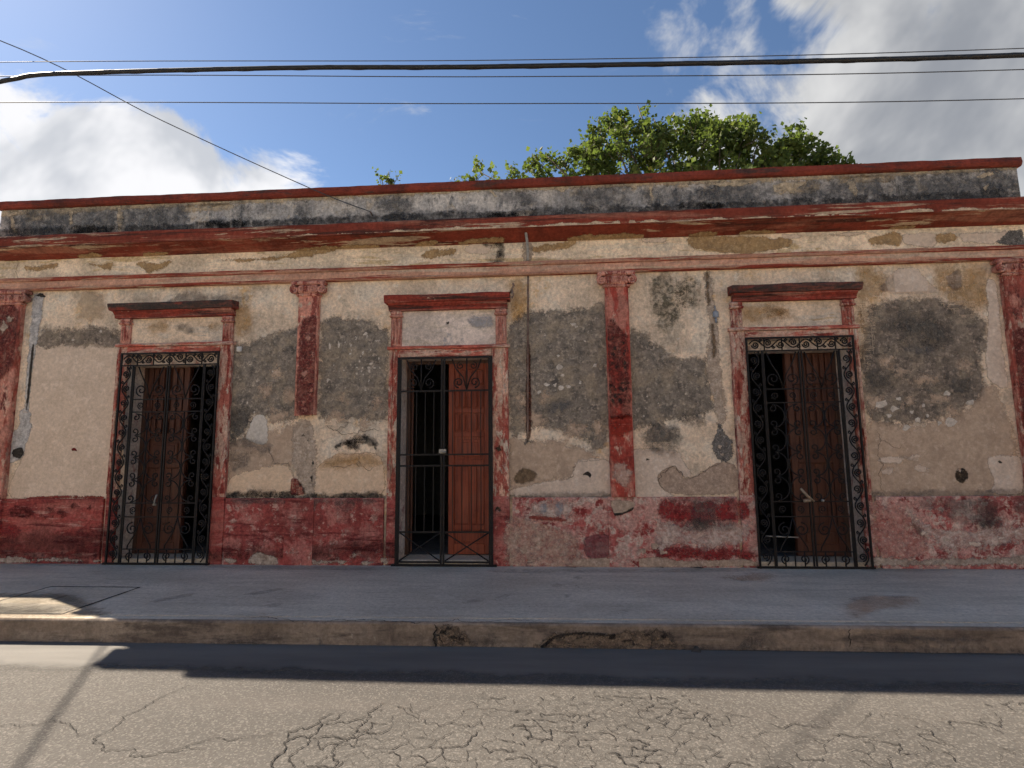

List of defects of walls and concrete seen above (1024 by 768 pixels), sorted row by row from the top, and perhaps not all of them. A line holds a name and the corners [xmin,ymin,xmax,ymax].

leakage [0,168,1021,237]
spalling [226,229,406,262]
spalling [415,225,505,259]
spalling [528,213,855,254]
spalling [832,207,1024,246]
spalling [657,423,739,495]
spalling [610,500,635,516]
peeling [504,499,610,567]
peeling [638,519,759,567]
peeling [865,500,1024,567]
spalling [436,624,470,647]
spalling [533,628,675,650]